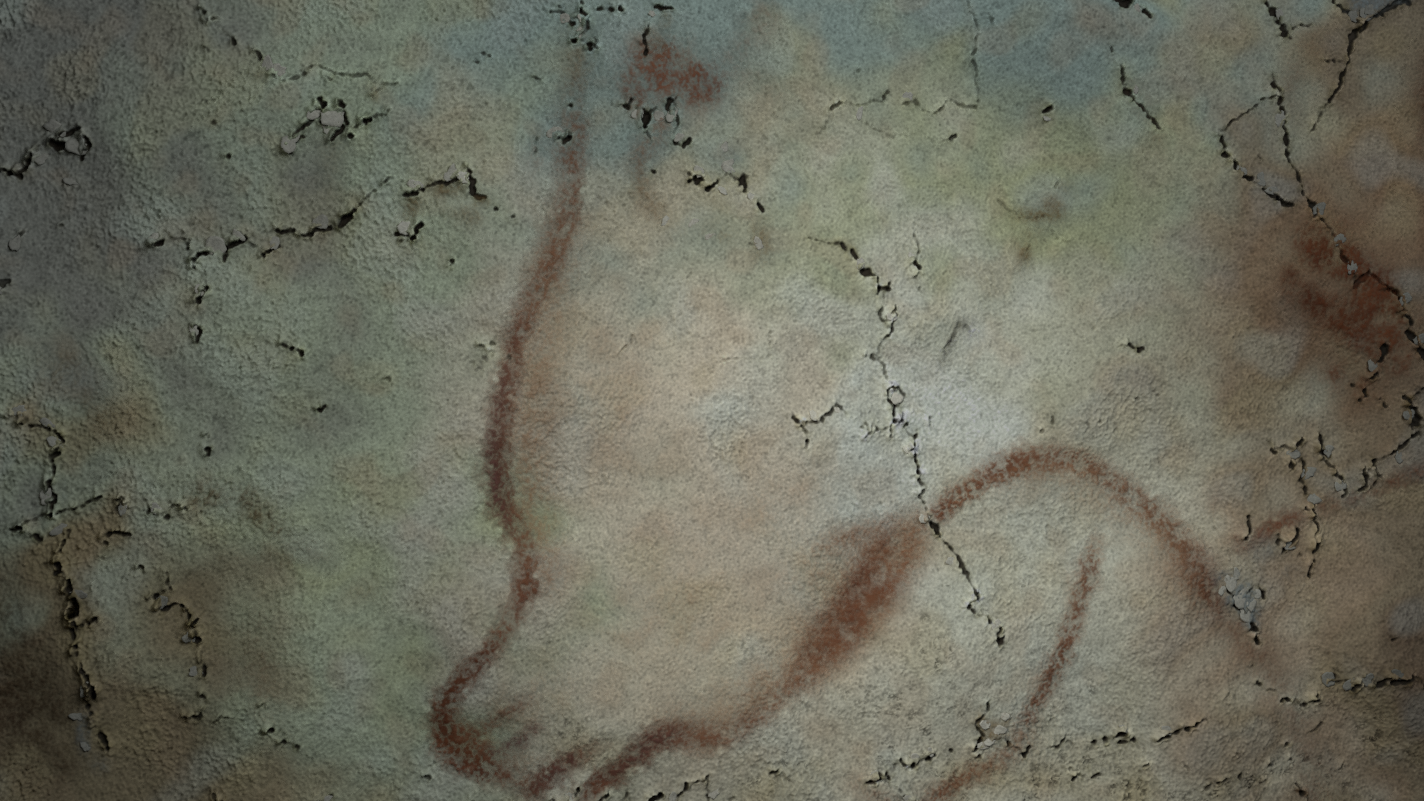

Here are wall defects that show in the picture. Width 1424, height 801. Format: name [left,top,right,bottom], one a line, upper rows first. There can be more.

crack [2,119,92,185]
crack [623,97,764,212]
crack [148,163,515,343]
crack [1219,0,1424,578]
crack [792,239,1004,645]
crack [10,405,207,751]
crack [1224,574,1265,645]
crack [1256,638,1415,727]
crack [866,703,1207,784]
crack [1205,743,1304,796]